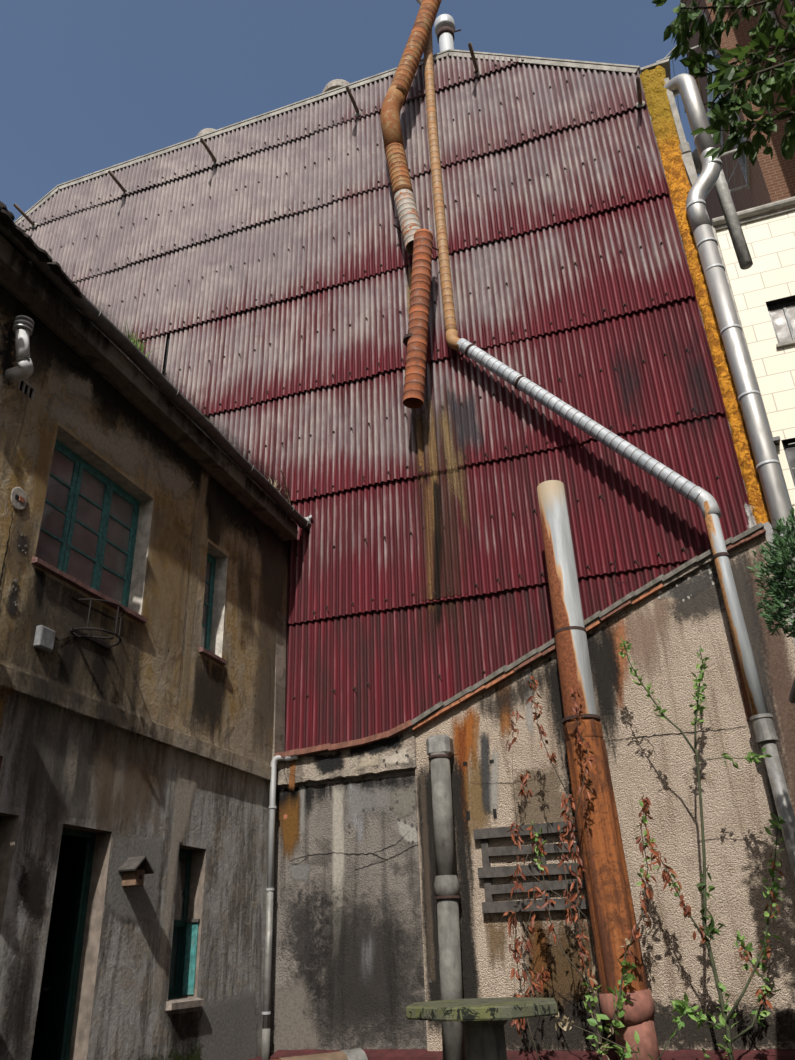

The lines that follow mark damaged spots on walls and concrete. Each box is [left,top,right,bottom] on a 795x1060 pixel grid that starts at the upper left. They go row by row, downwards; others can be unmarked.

rust [385,142,414,197]
rust [611,617,630,706]
damp [309,733,403,774]
rust [453,710,487,839]
damp [18,854,49,918]
damp [153,765,197,1006]
damp [288,783,423,1049]
damp [0,931,36,1060]
damp [169,1010,199,1059]